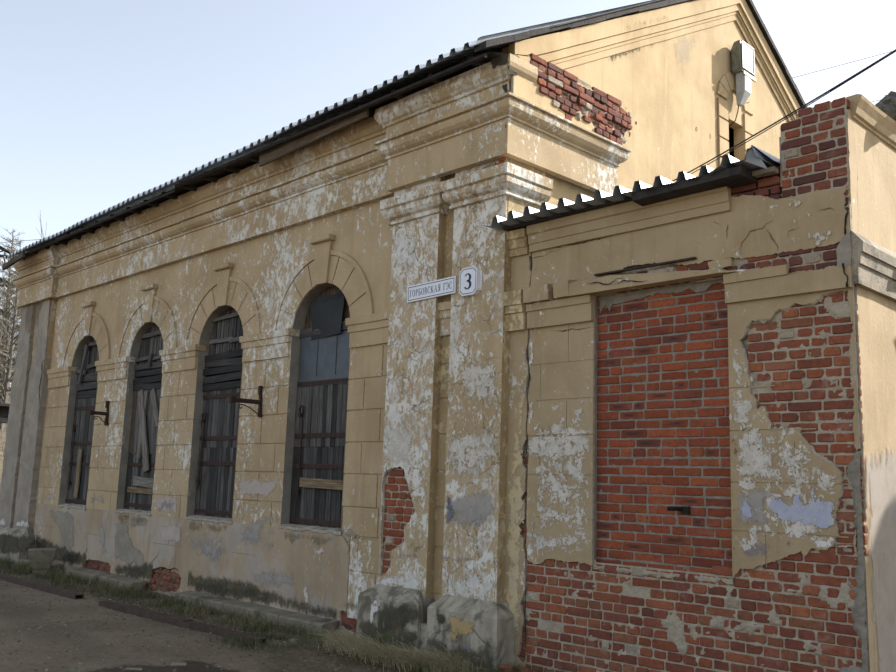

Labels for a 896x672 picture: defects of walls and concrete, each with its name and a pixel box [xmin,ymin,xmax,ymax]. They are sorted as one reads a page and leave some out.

flaking render [526,53,632,145]
flaking render [731,97,850,207]
crack [715,221,797,259]
peeling [461,361,498,405]
crack [525,348,533,411]
peeling [445,426,500,476]
flaking render [505,285,870,672]
flaking render [81,559,111,573]
flaking render [145,569,181,593]
flaking render [377,467,422,590]
peeling [443,572,494,601]
crack [518,440,529,663]